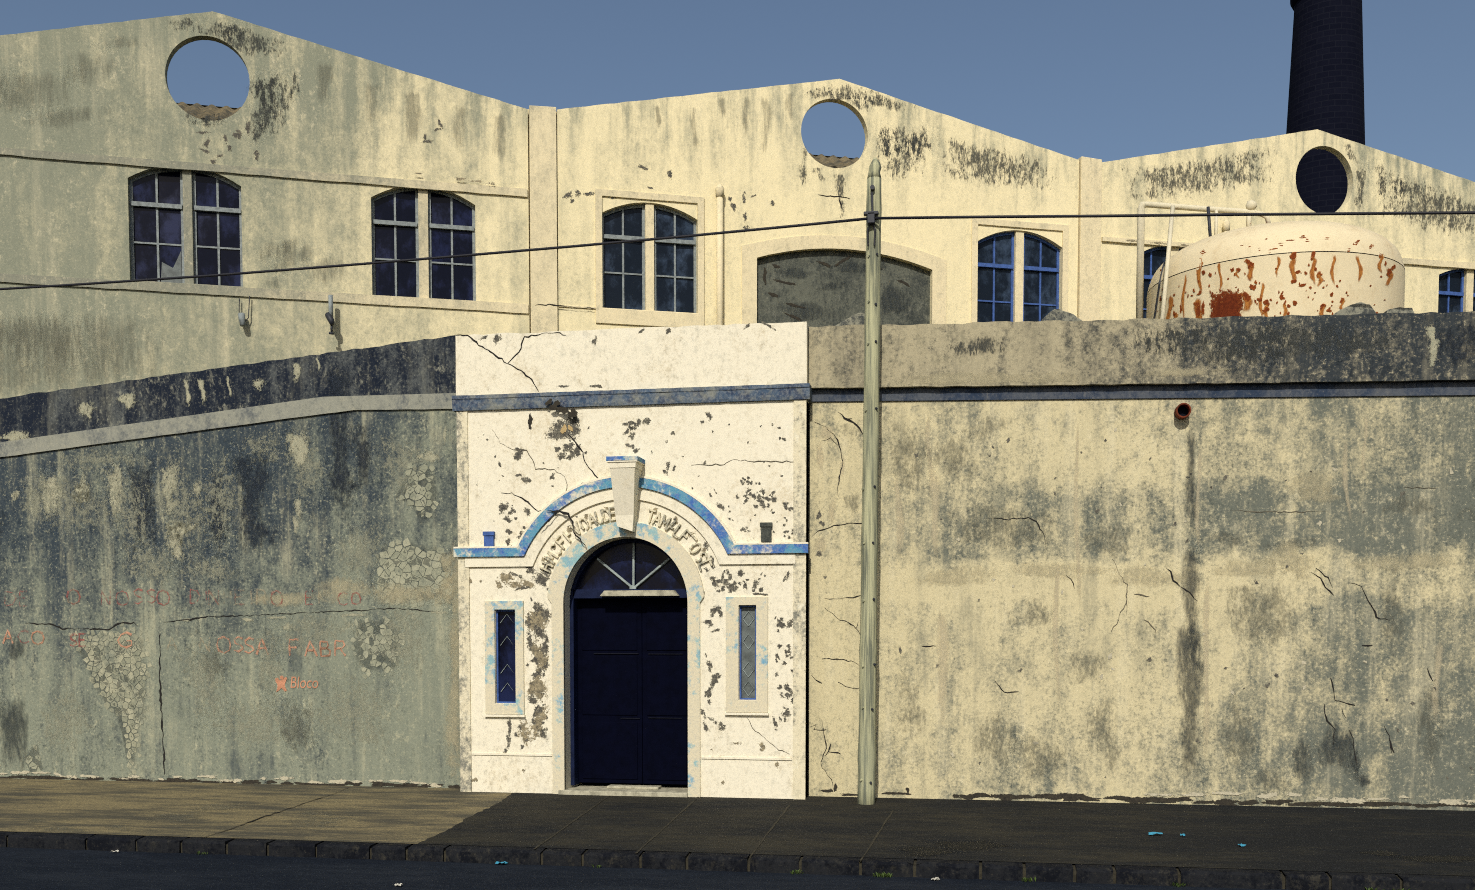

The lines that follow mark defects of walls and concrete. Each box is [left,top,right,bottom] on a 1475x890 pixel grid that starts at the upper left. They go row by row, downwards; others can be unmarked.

damp [248,73,299,140]
damp [810,85,1047,189]
damp [1122,149,1274,199]
corrosion [1157,235,1396,319]
crack [458,304,594,390]
damp [0,431,29,441]
damp [19,358,428,583]
peeling [483,434,531,483]
flaking render [528,385,590,487]
damp [1188,440,1201,525]
peeling [469,546,556,753]
damp [1115,552,1209,763]